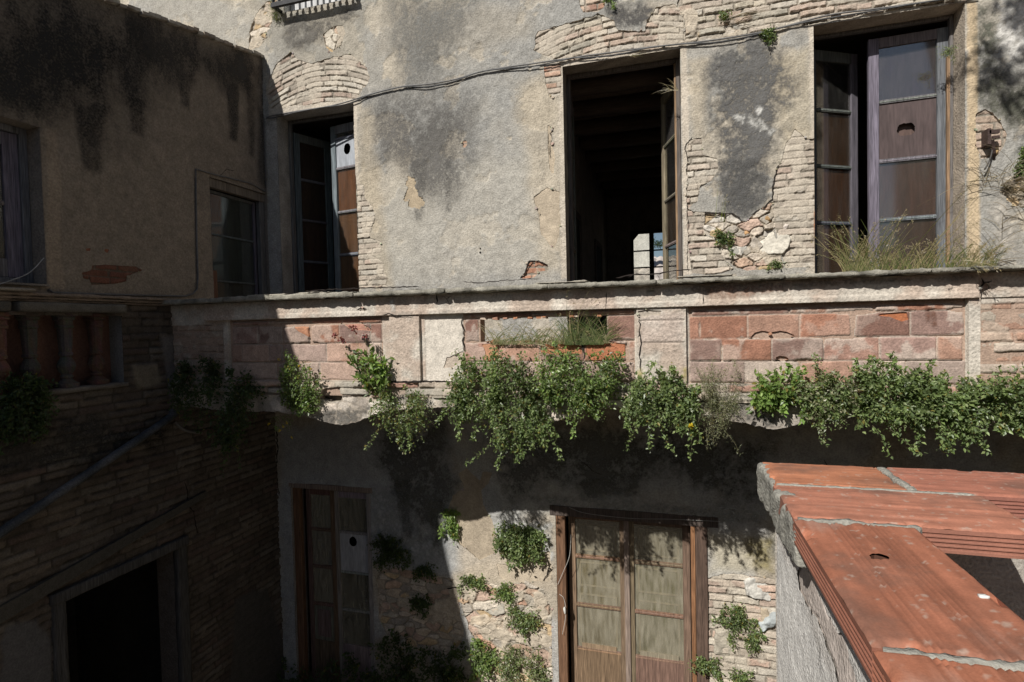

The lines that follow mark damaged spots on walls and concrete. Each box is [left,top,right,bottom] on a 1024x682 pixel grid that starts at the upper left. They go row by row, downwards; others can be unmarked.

water stain [0,0,267,185]
spalling [249,0,277,50]
spalling [266,25,370,109]
water stain [377,97,469,196]
spalling [533,0,965,98]
water stain [706,37,794,218]
spalling [974,109,1007,159]
water stain [975,0,1024,124]
spalling [356,184,388,289]
spalling [685,129,815,275]
spalling [376,469,553,682]
spalling [708,573,776,682]